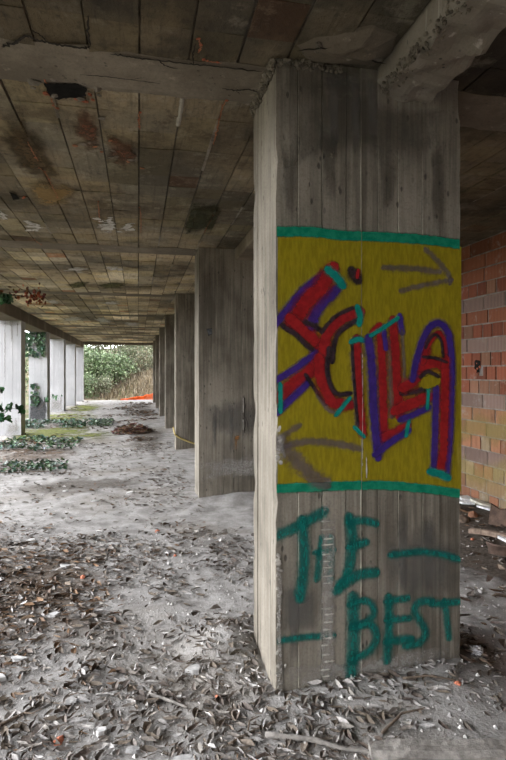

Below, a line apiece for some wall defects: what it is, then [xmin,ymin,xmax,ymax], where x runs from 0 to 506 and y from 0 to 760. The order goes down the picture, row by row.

spalling [27,78,102,109]
crack [80,44,262,84]
spalling [379,0,473,96]
leakage [0,120,73,204]